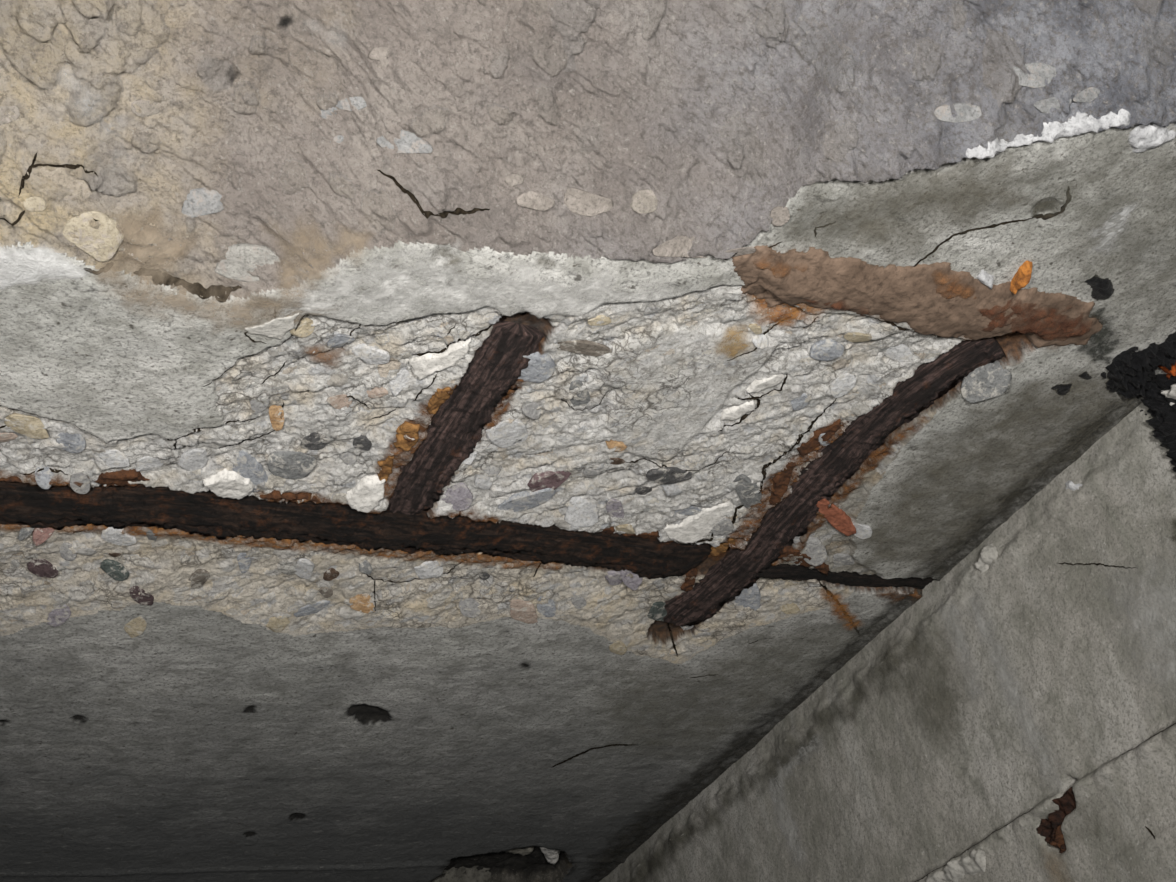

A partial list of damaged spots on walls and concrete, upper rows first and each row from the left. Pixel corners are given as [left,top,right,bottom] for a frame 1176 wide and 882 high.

crack [0,153,98,226]
crack [378,170,490,219]
rust [0,245,1103,629]
spalling [0,285,1012,664]
spalling [431,846,573,882]
rust [1049,824,1066,851]